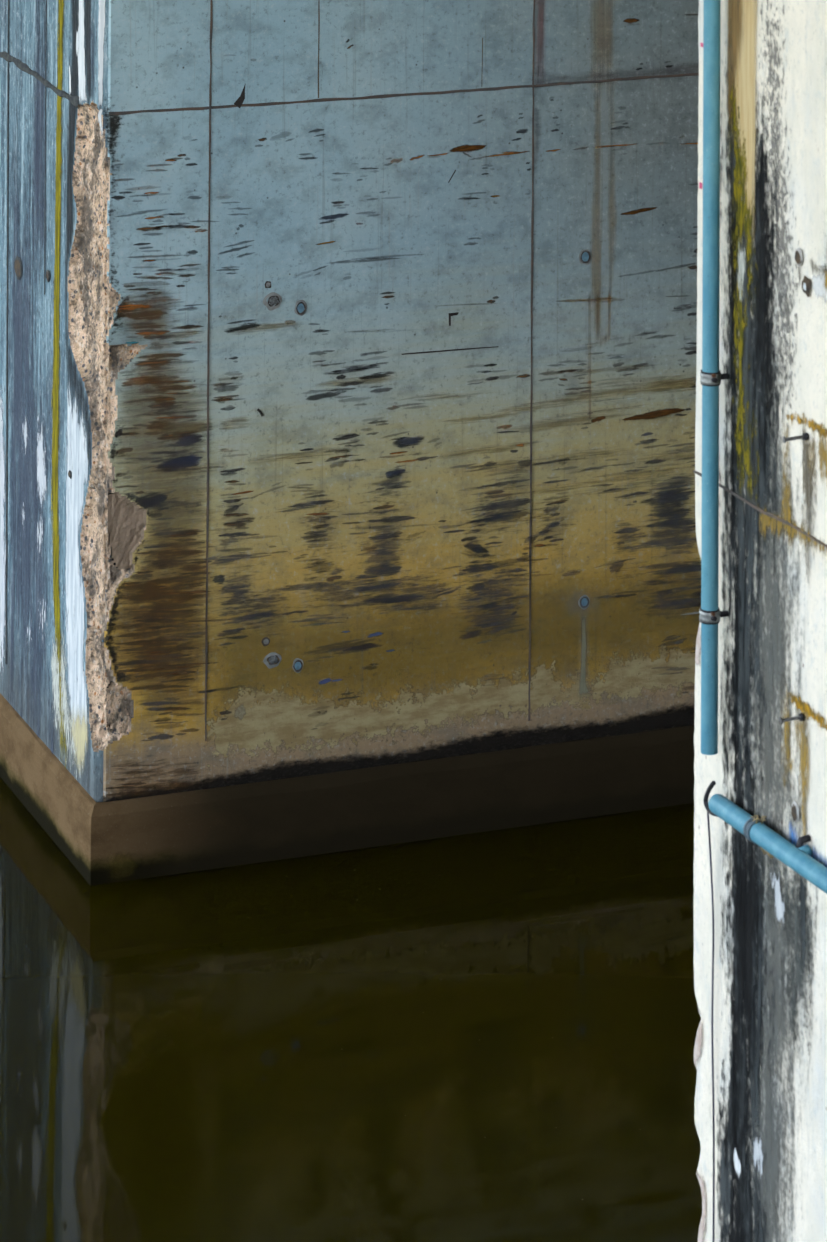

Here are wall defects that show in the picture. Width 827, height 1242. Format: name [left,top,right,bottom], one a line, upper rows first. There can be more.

leakage [148,154,198,171]
rust [391,145,529,162]
leakage [321,201,363,225]
leakage [313,258,399,275]
leakage [111,191,254,471]
leakage [219,315,284,333]
leakage [307,350,394,400]
leakage [516,342,697,397]
spalling [68,100,148,752]
leakage [719,0,827,845]
leakage [100,407,701,802]
leakage [717,821,817,1242]